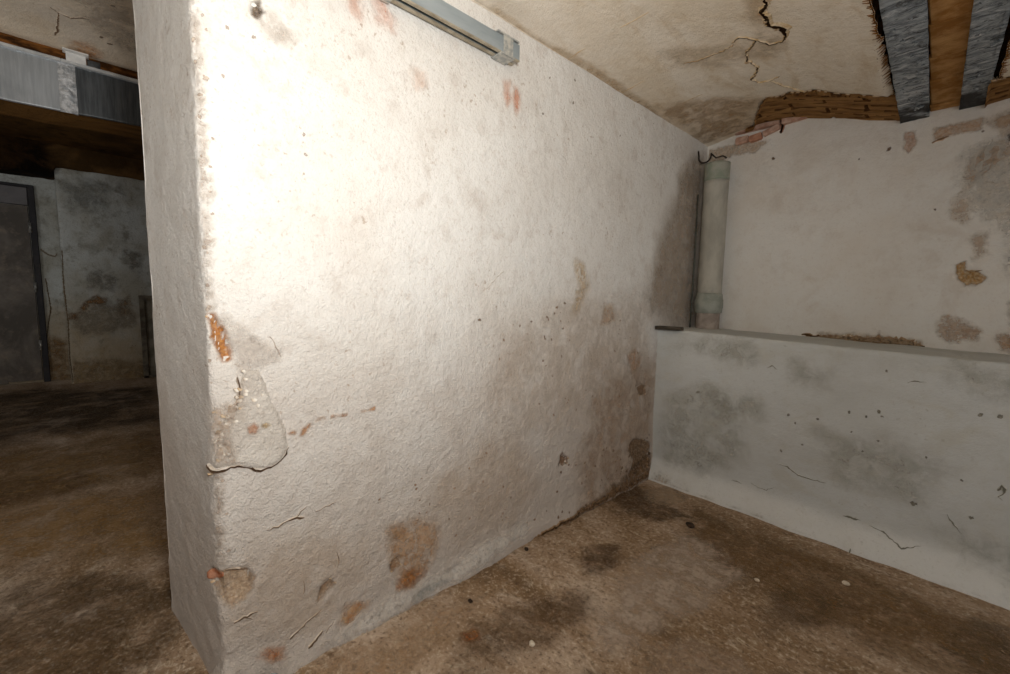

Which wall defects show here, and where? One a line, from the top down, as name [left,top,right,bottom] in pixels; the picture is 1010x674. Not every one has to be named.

crack [683,0,806,92]
flaking render [709,0,900,162]
flaking render [973,16,1010,107]
peeling [935,118,984,139]
flaking render [956,261,986,285]
flaking render [205,305,230,362]
crack [267,502,336,530]
crack [843,515,915,550]
flaking render [207,568,255,605]
crack [289,581,334,649]